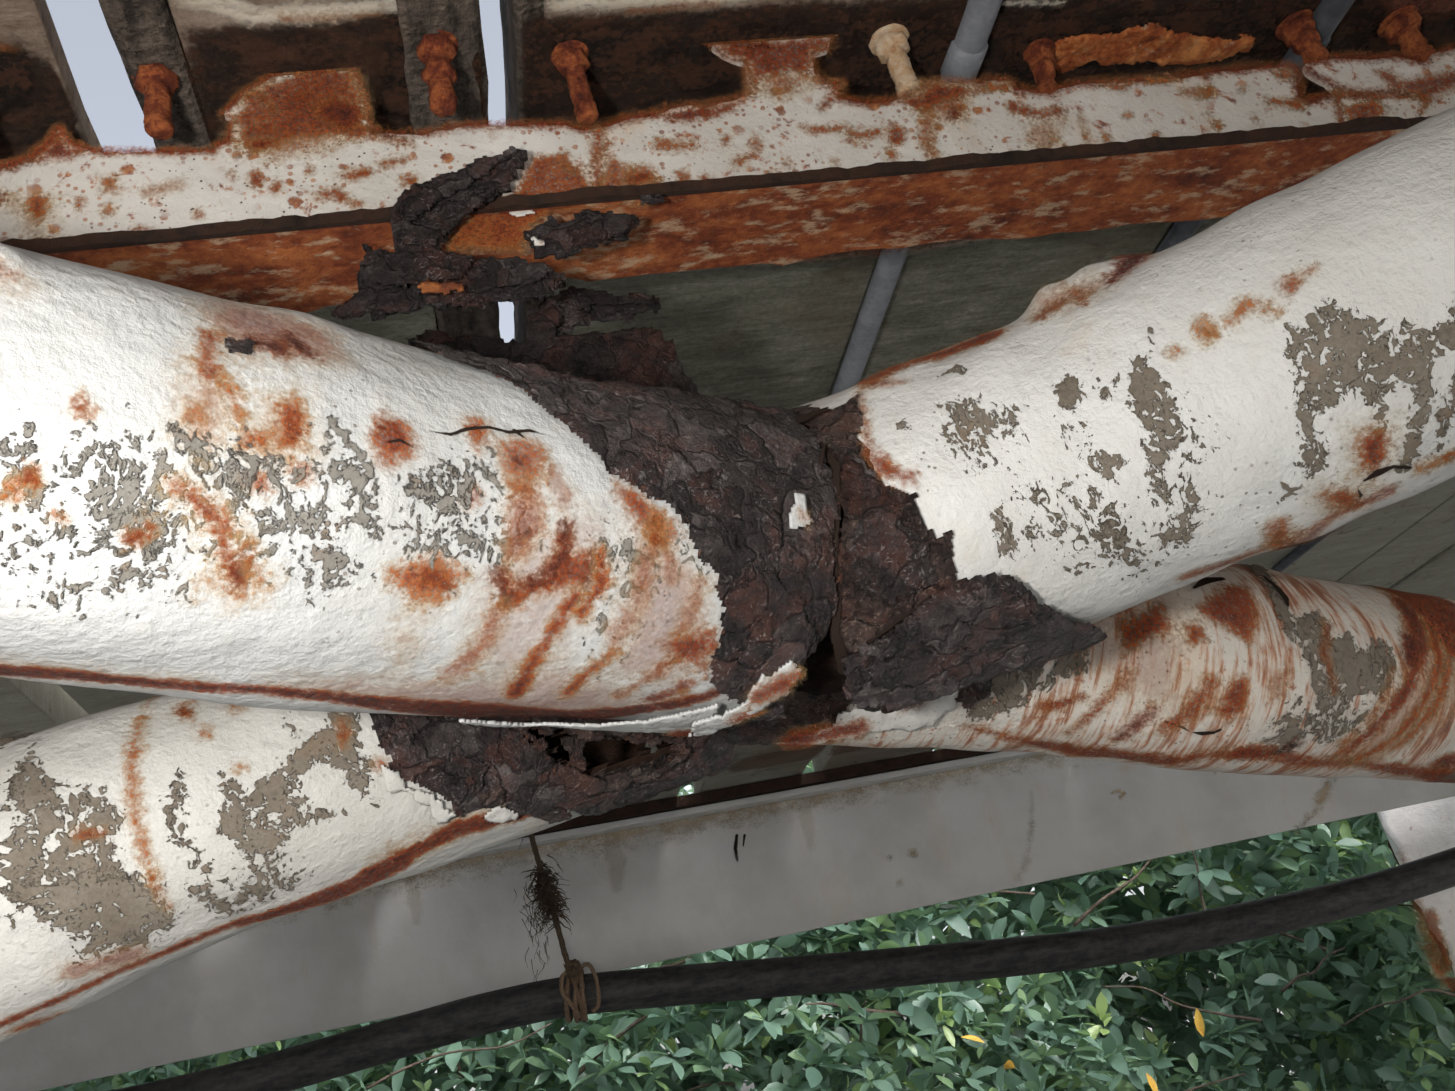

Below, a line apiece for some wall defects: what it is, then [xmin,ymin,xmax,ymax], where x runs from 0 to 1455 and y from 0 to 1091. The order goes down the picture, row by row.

rust [0,0,1455,346]
rust [183,306,333,485]
rust [855,328,1004,484]
peeling [932,327,1230,581]
peeling [1276,297,1455,505]
rust [0,412,720,892]
peeling [0,336,1097,966]
rust [967,427,1455,783]
peeling [1244,564,1400,756]
peeling [1430,753,1455,781]
rust [0,813,532,1033]